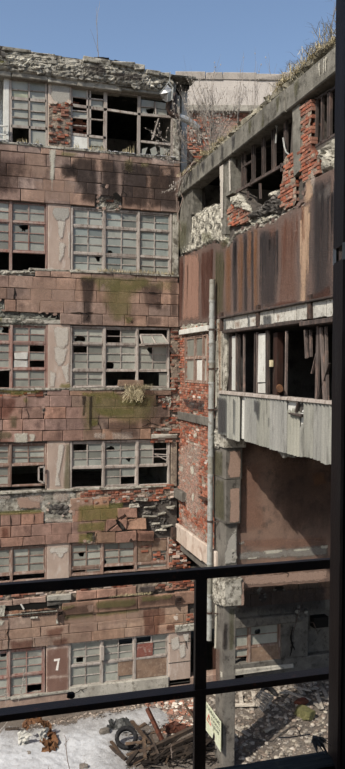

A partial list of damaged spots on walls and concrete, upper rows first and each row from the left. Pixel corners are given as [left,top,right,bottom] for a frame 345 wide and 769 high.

spalling [2,52,164,91]
spalling [282,35,336,90]
flaking render [48,84,73,147]
damp [49,149,176,208]
flaking render [219,99,322,247]
rust [225,230,258,311]
damp [82,279,93,322]
peeling [0,299,69,397]
damp [83,391,141,426]
flaking render [150,320,209,443]
crack [95,514,137,544]